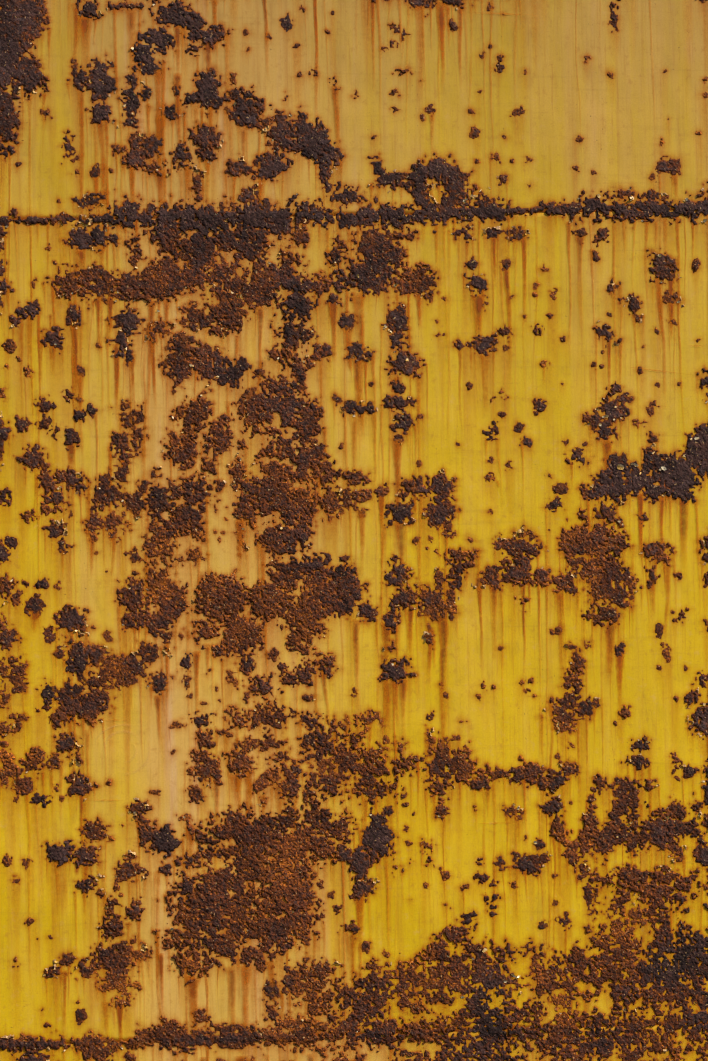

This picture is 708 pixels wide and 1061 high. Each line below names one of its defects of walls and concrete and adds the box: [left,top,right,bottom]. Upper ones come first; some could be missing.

rust [74,0,104,44]
rust [263,0,293,42]
rust [371,0,473,60]
rust [608,0,621,33]
rust [453,256,514,364]
rust [73,403,98,423]
rust [331,393,378,418]
rust [0,535,18,565]
rust [471,381,708,683]
rust [0,572,62,624]
rust [460,858,501,917]
rust [538,911,572,942]